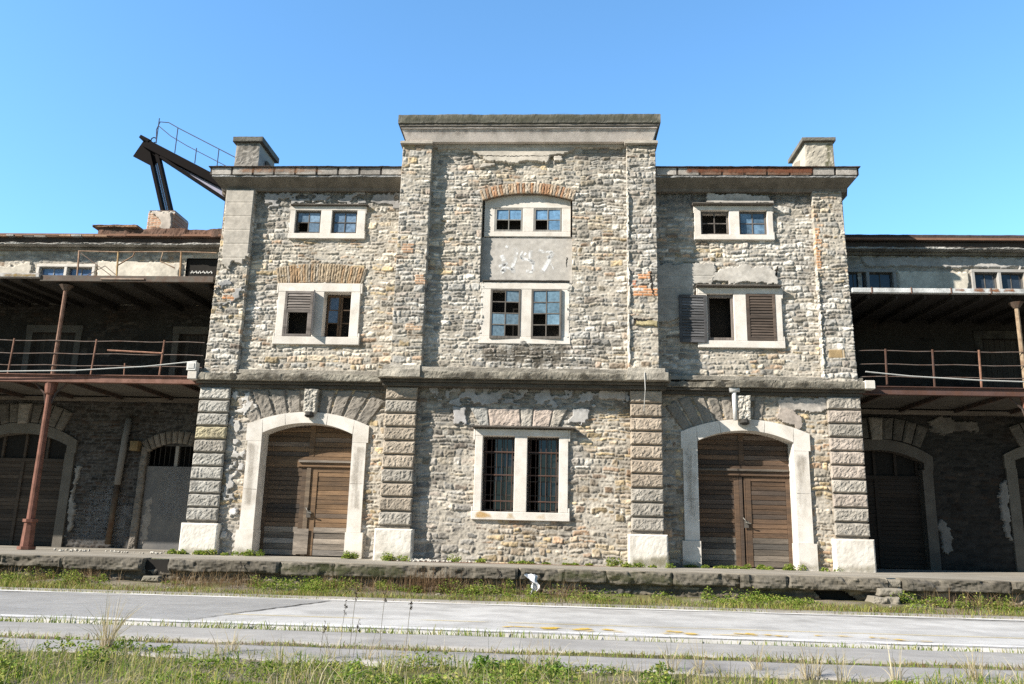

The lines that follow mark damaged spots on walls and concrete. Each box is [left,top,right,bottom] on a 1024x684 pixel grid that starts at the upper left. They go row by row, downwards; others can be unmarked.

flaking render [657,262,778,324]
flaking render [64,465,83,537]
flaking render [937,519,954,555]
flaking render [997,480,1014,542]